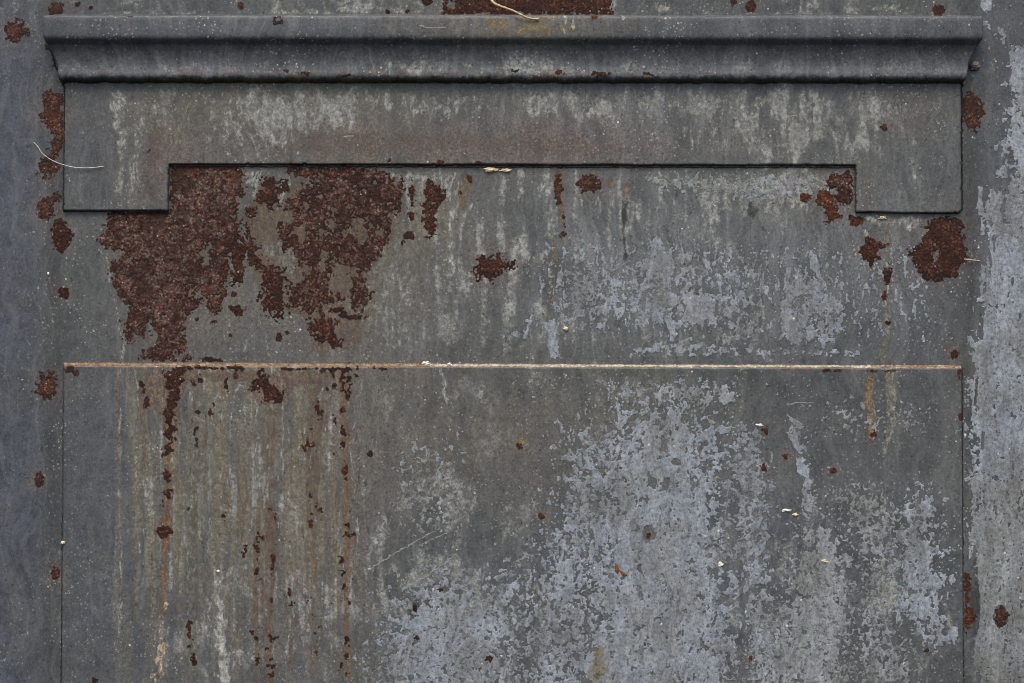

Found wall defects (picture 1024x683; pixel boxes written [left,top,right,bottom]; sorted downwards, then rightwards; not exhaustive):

rust [421,0,616,19]
rust [35,88,64,181]
rust [962,90,986,134]
rust [469,252,518,284]
rust [552,169,630,265]
rust [799,170,893,300]
rust [907,215,970,282]
rust [31,158,472,683]
rust [963,572,978,634]
rust [993,605,1010,629]